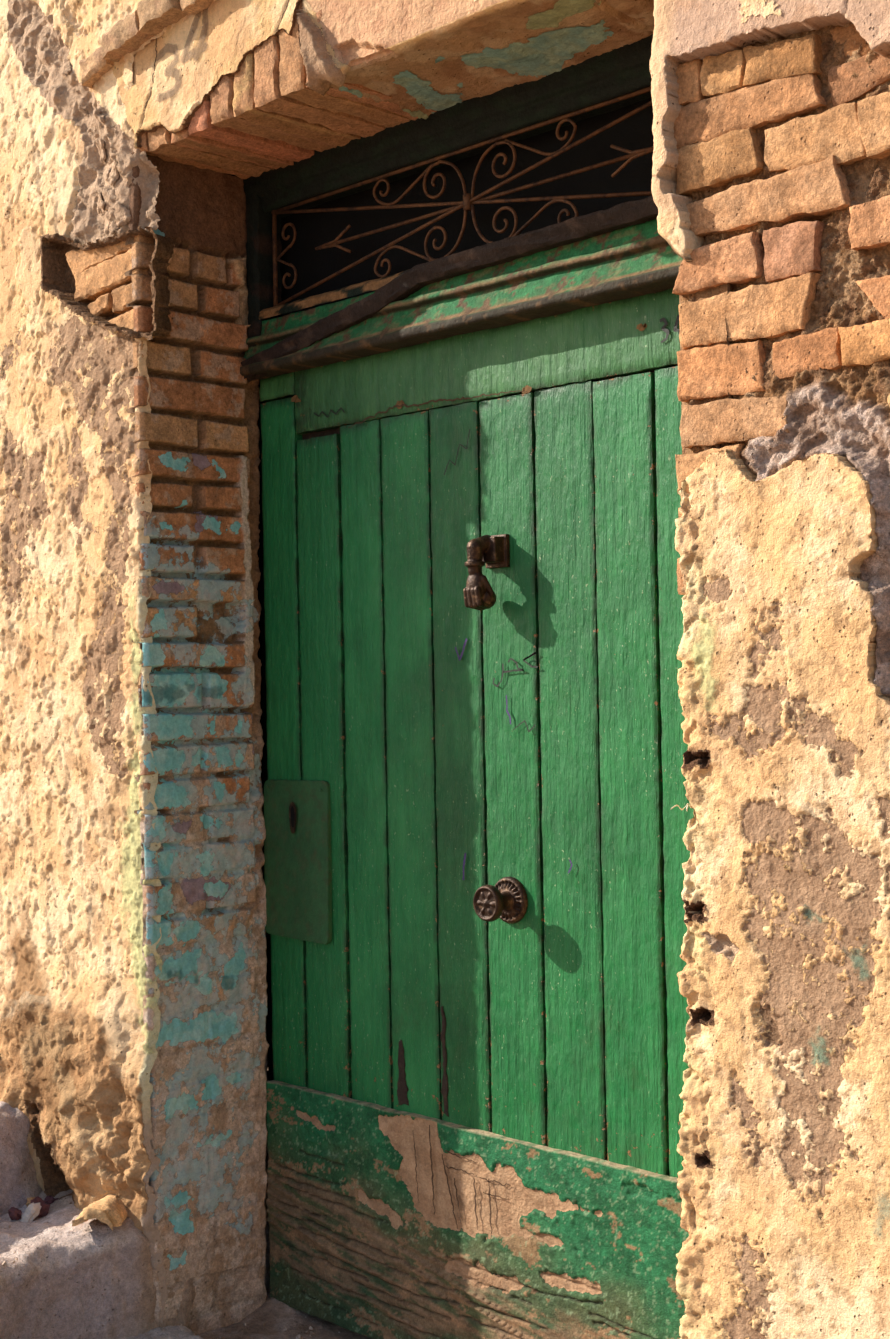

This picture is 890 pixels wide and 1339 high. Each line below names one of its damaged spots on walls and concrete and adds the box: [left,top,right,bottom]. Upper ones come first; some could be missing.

peeling [461,0,614,77]
spalling [672,22,890,697]
peeling [0,0,502,1271]
peeling [681,602,863,778]
peeling [358,1114,603,1247]
peeling [682,797,890,1215]